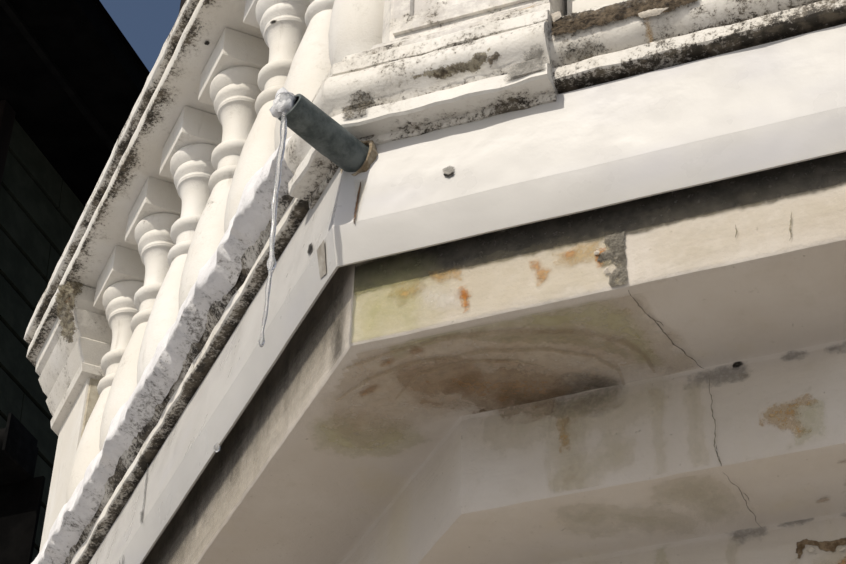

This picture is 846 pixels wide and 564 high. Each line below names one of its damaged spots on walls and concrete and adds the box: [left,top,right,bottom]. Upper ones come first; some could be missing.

spalling [551,0,697,37]
corrosion [530,261,549,282]
spalling [594,231,628,287]
water stain [349,311,639,430]
crack [628,290,761,527]
peeling [796,538,846,558]